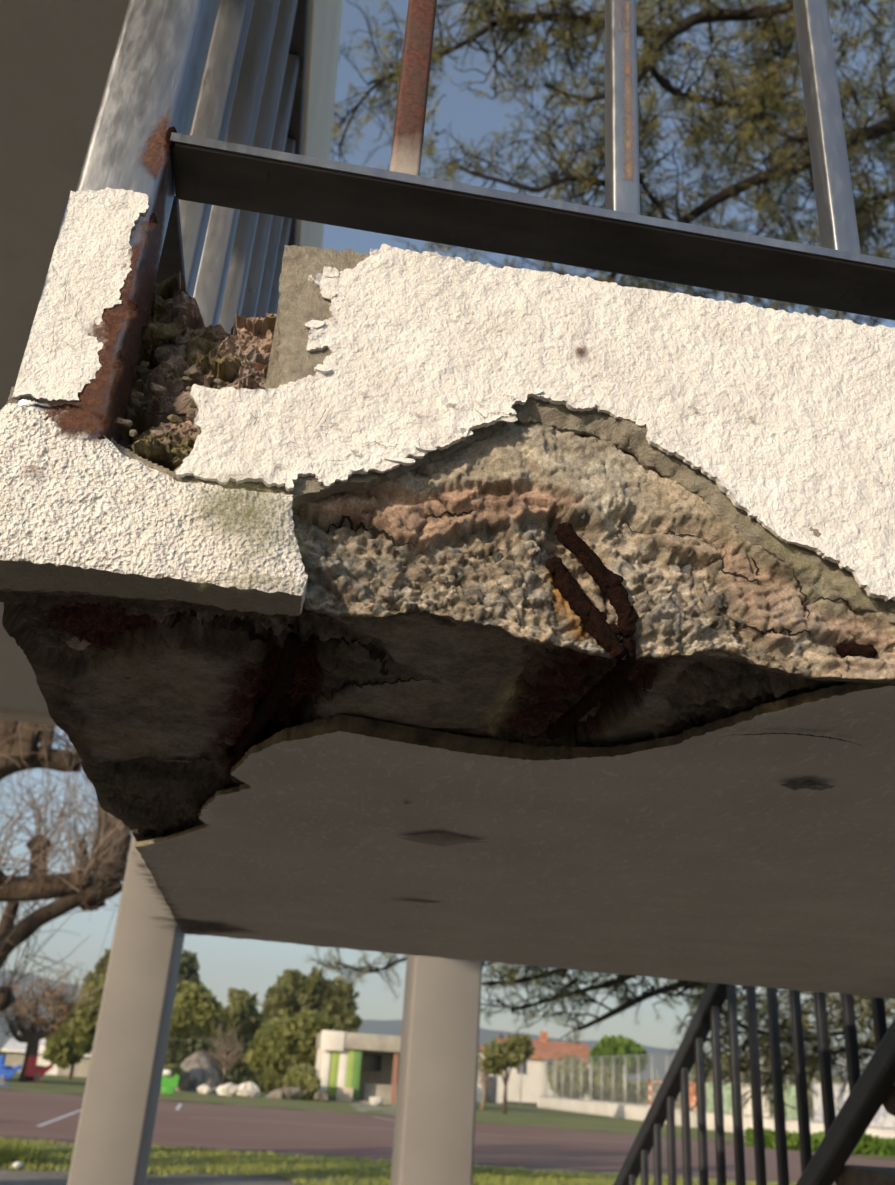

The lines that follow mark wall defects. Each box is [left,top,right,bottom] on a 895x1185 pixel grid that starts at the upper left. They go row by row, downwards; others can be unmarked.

corrosion [619,0,633,179]
corrosion [43,116,177,444]
spalling [111,271,277,479]
peeling [305,320,324,329]
peeling [320,266,339,300]
crack [315,512,415,547]
crack [300,634,437,709]
spalling [0,394,895,842]
crack [425,509,477,518]
corrosion [501,578,606,735]
corrosion [585,657,669,732]
crack [626,514,859,637]